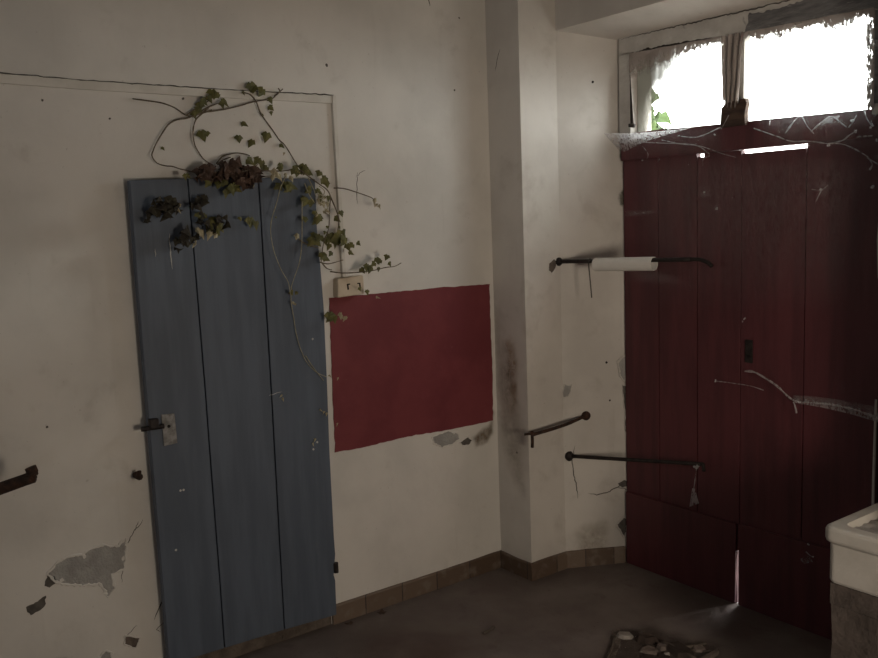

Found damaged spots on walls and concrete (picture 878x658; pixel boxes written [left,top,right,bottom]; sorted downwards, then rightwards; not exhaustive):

spalling [26,538,128,615]